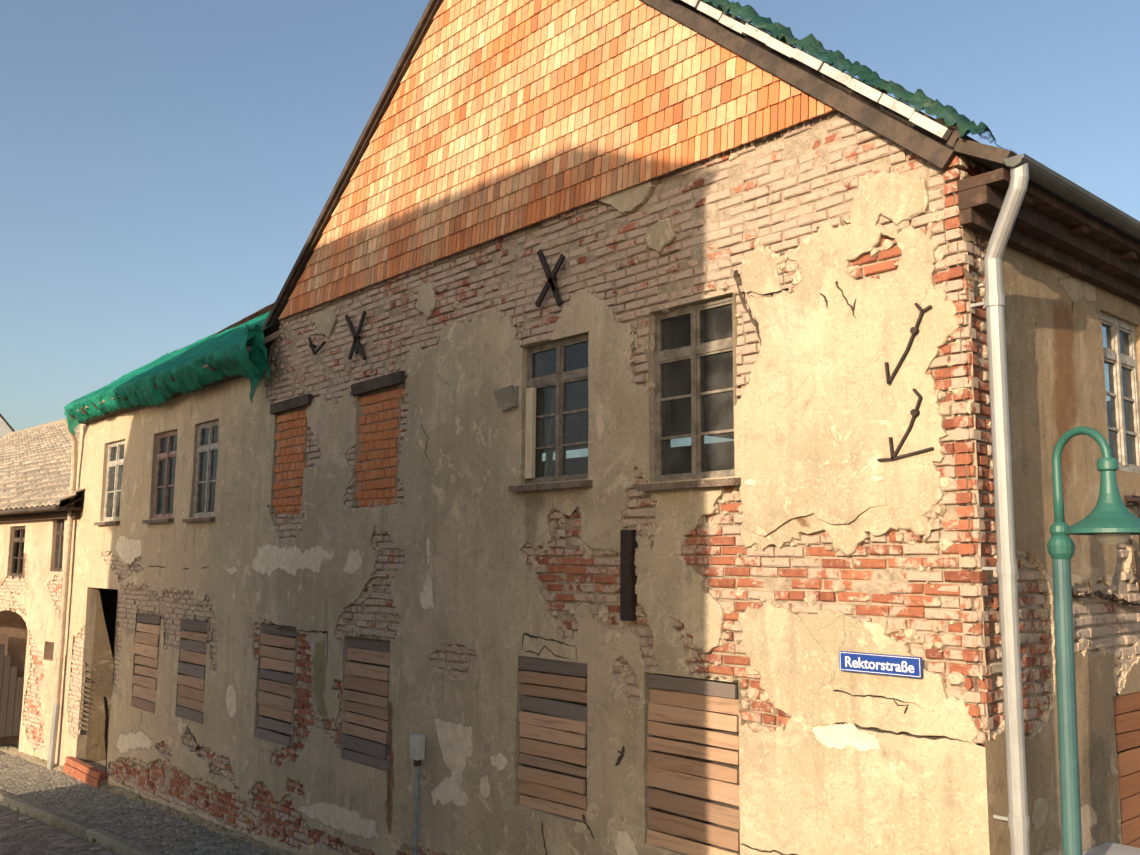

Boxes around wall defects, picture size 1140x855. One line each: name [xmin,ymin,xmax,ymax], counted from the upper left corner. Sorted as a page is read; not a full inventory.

flaking render [1059,277,1096,303]
spalling [264,110,1005,752]
spalling [0,553,89,754]
spalling [101,504,405,855]
spalling [1015,546,1056,741]
spalling [1071,537,1140,694]
flaking render [430,718,507,808]
flaking render [614,817,638,855]
crack [741,844,798,855]
flaking render [1081,803,1097,852]